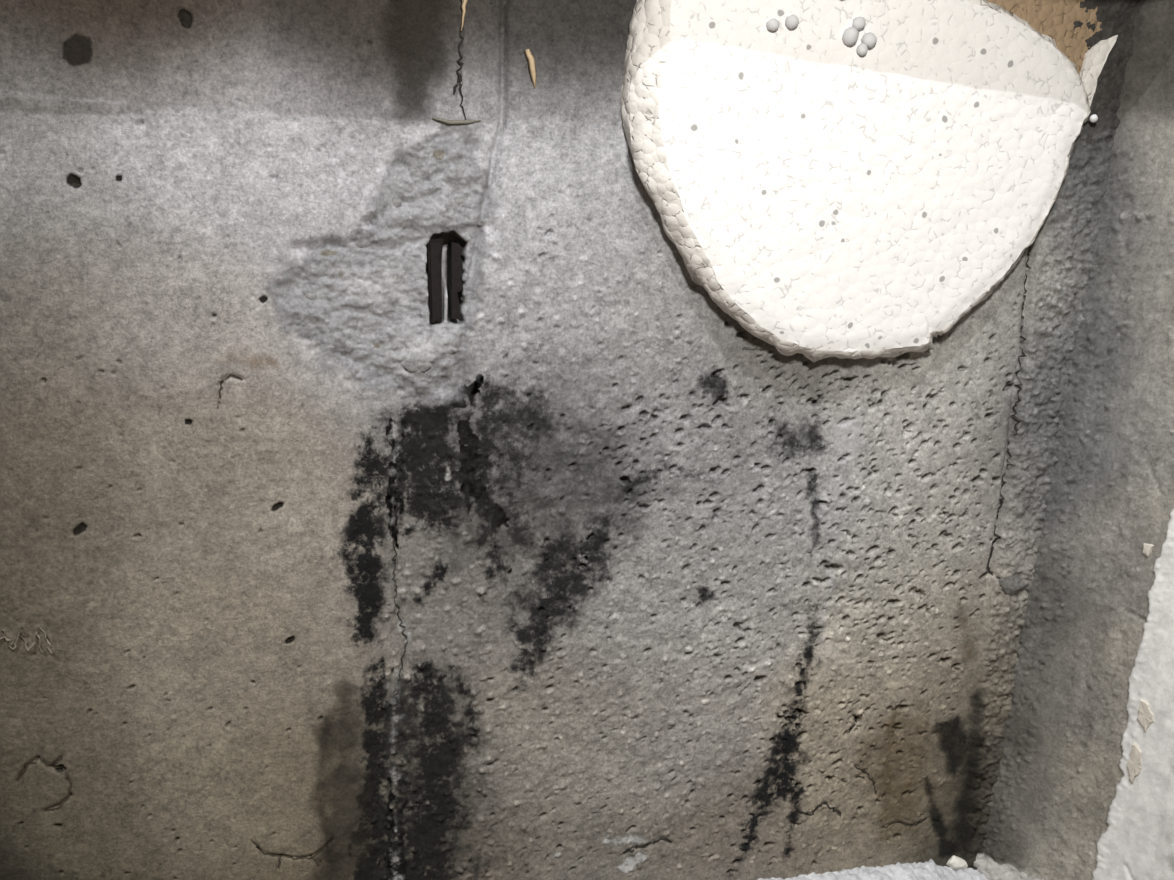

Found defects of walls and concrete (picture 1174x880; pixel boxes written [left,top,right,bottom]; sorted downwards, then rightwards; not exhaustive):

crack [453,27,466,120]
spalling [259,117,496,402]
leakage [317,658,477,880]
crack [392,424,408,698]
leakage [338,381,681,673]
leakage [727,605,821,874]
leakage [925,693,984,857]
crack [986,253,1030,579]
flaking render [973,853,1044,880]
flaking render [1092,508,1174,880]